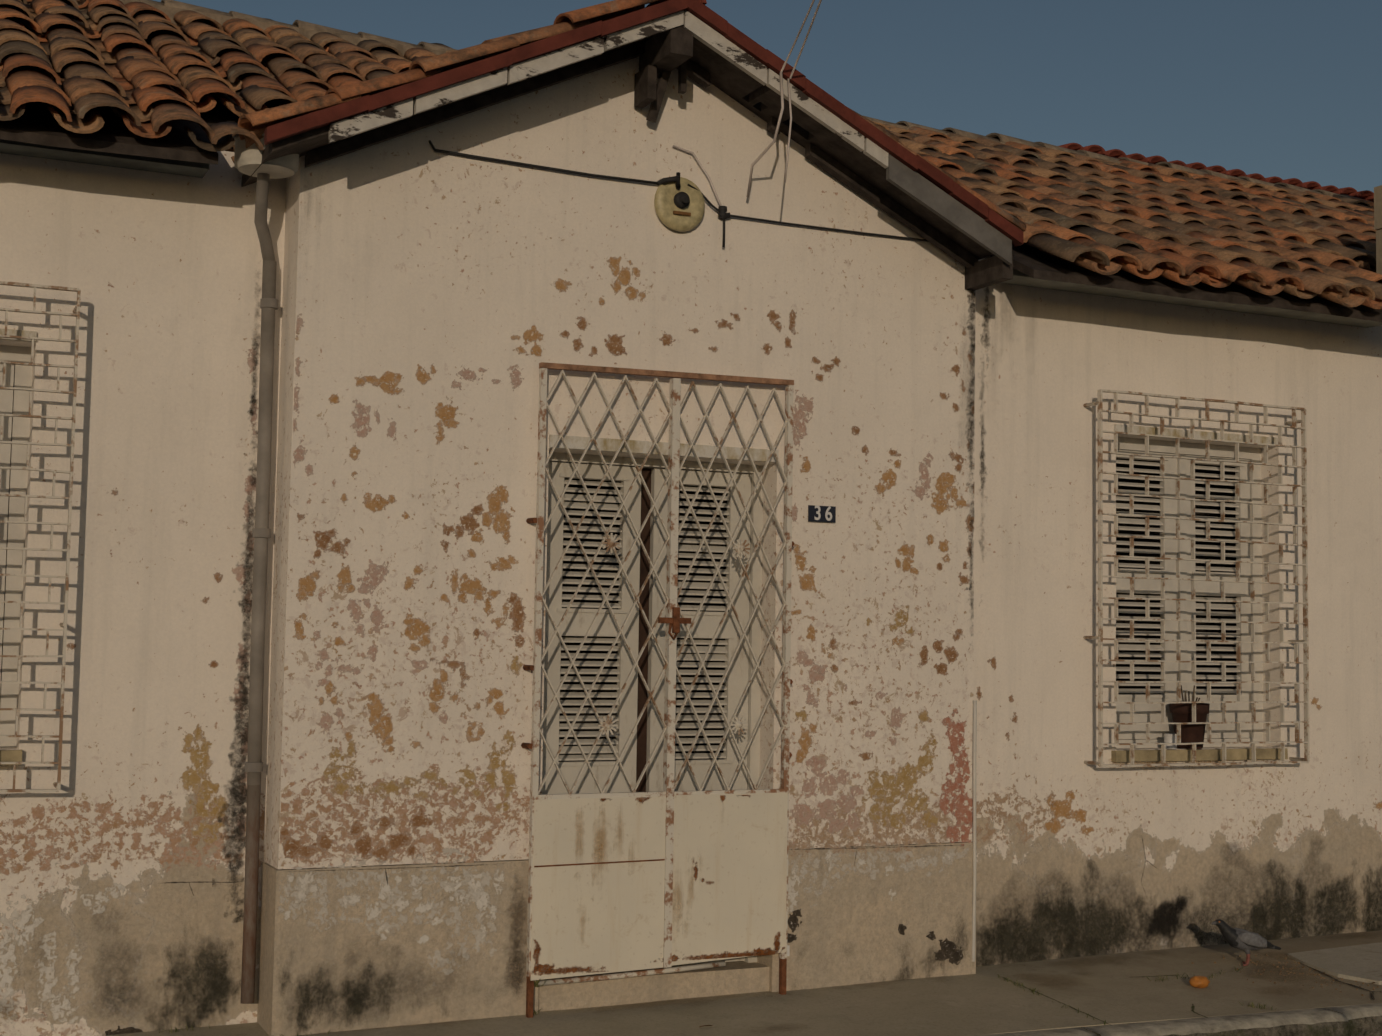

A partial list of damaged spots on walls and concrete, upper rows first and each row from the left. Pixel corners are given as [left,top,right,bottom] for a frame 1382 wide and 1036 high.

peeling [328,363,436,522]
peeling [895,439,974,586]
peeling [440,485,526,677]
peeling [0,529,530,1036]
peeling [787,601,1382,966]
damp [170,943,236,1026]
damp [297,975,385,1020]
rust [533,940,608,976]
rust [654,932,785,962]
damp [976,900,1127,965]
damp [1147,898,1186,935]
damp [1250,871,1382,940]